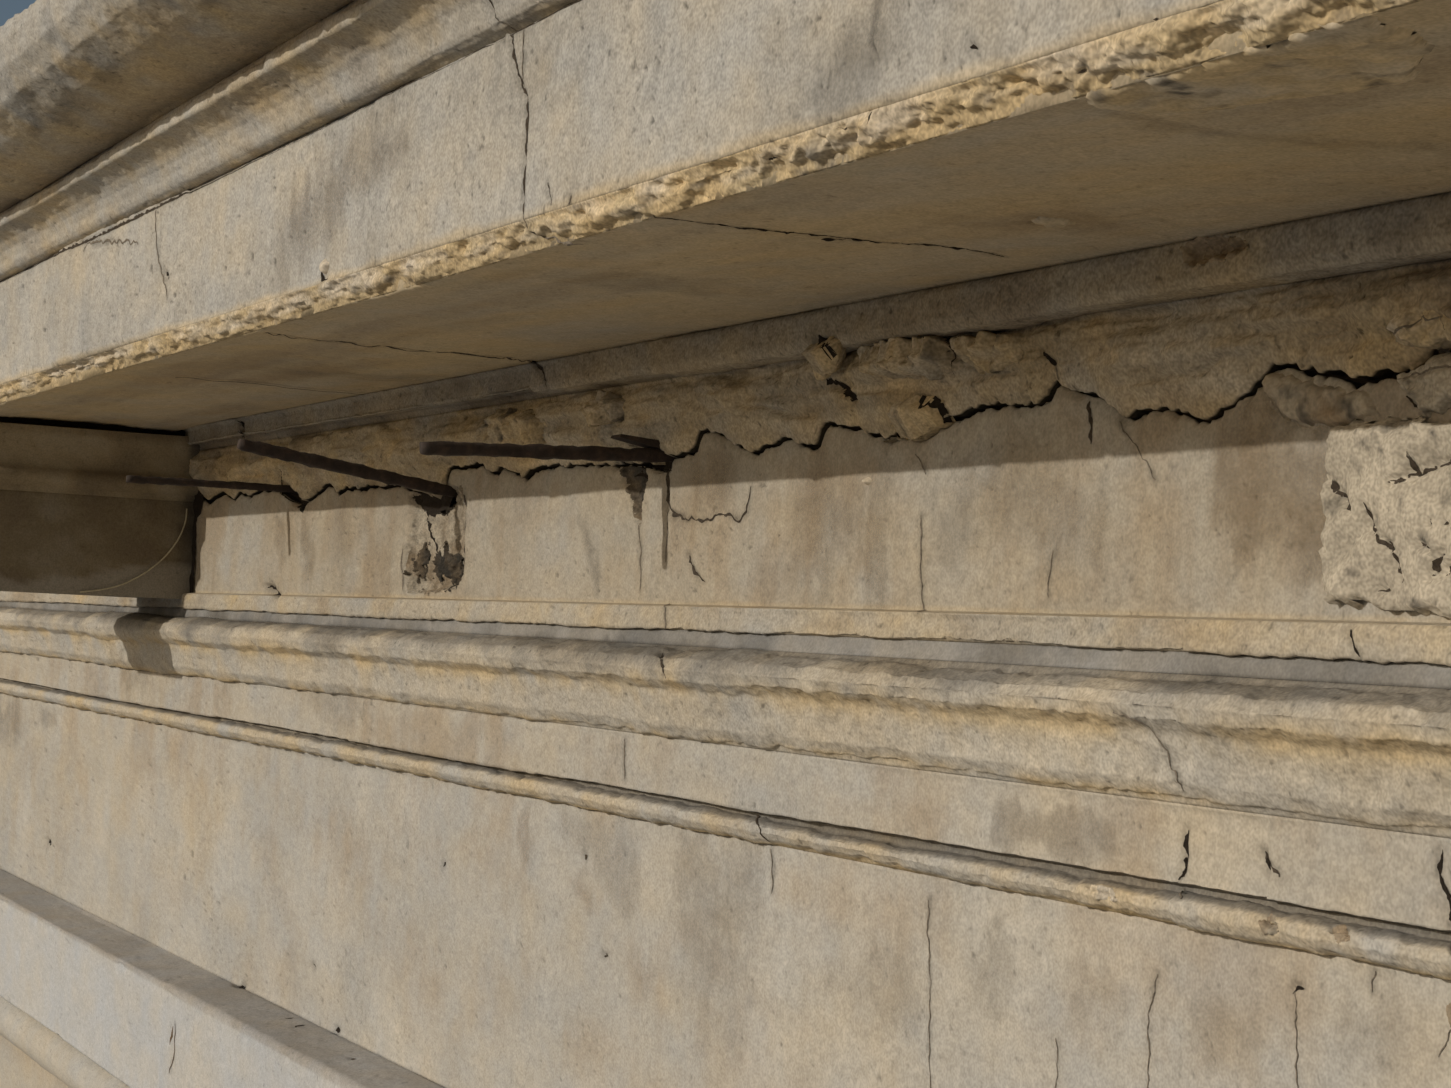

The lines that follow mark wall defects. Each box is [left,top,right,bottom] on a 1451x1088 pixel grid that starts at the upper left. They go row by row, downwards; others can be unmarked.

crack [489,0,583,246]
spalling [475,408,547,445]
corrosion [611,434,660,449]
peeling [883,395,956,443]
spalling [1386,309,1451,419]
spalling [400,485,467,595]
spalling [619,465,648,591]
crack [628,454,751,582]
crack [1331,451,1451,583]
peeling [1421,542,1451,576]
crack [1178,830,1189,899]
crack [1437,850,1451,921]